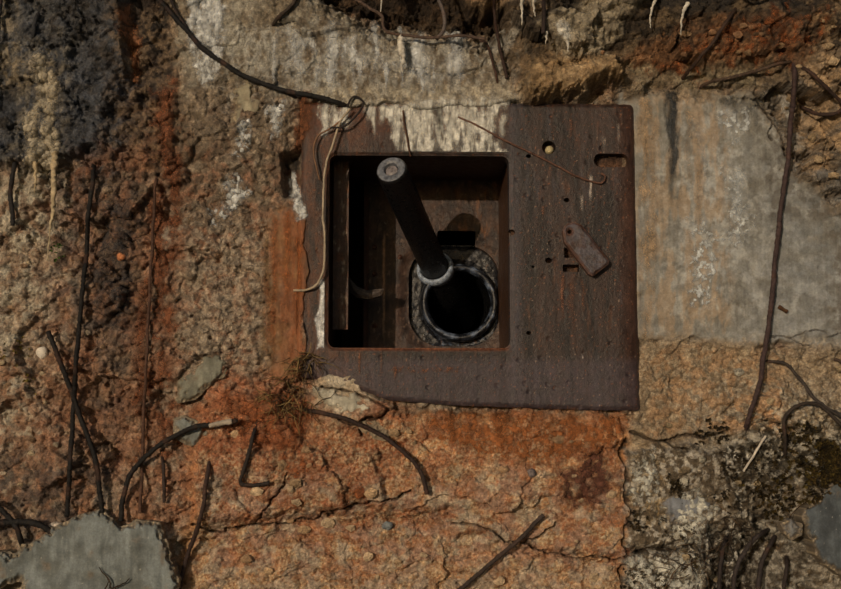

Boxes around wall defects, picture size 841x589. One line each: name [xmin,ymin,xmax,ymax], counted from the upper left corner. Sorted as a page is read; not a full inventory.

spalling [321,0,584,77]
efflorescence [23,53,60,178]
efflorescence [321,104,349,136]
efflorescence [366,97,507,152]
damp [665,93,679,175]
spalling [600,0,841,198]
rust [132,78,182,441]
spalling [0,149,841,589]
crack [770,329,841,347]
crack [191,472,412,534]
rust [429,412,622,508]
crack [452,430,725,589]